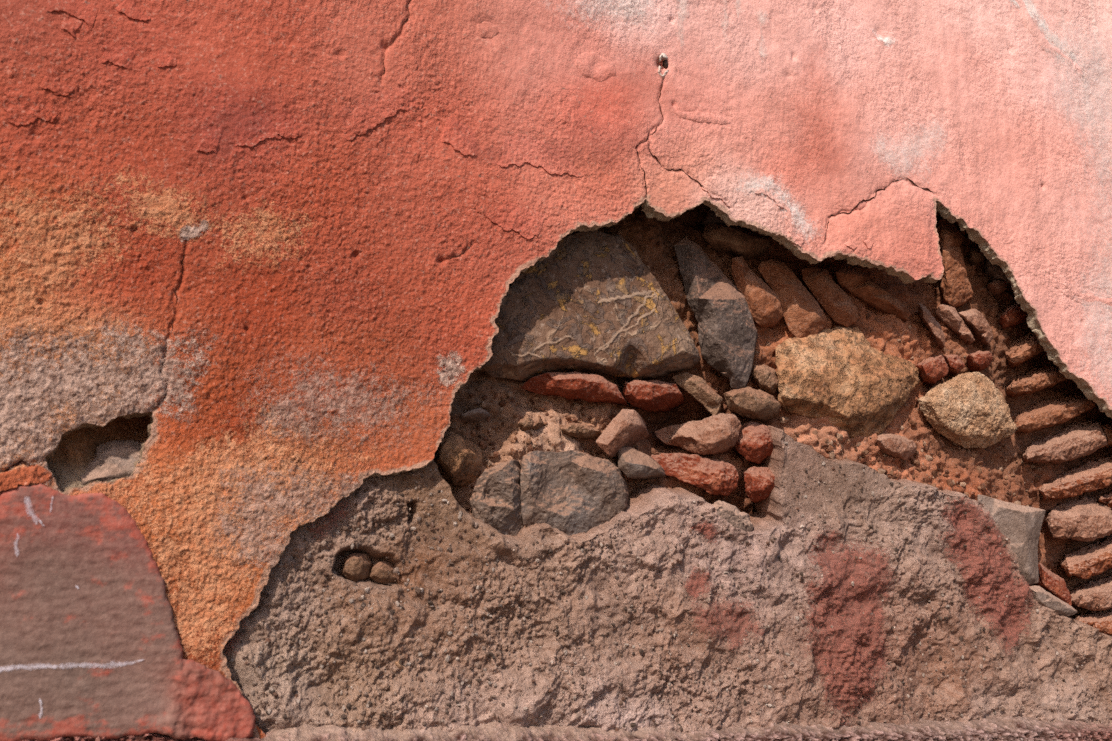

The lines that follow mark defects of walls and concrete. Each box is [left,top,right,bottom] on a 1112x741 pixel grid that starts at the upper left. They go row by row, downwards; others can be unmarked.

crack [636,81,704,197]
spalling [0,412,154,493]
spalling [222,171,1112,733]